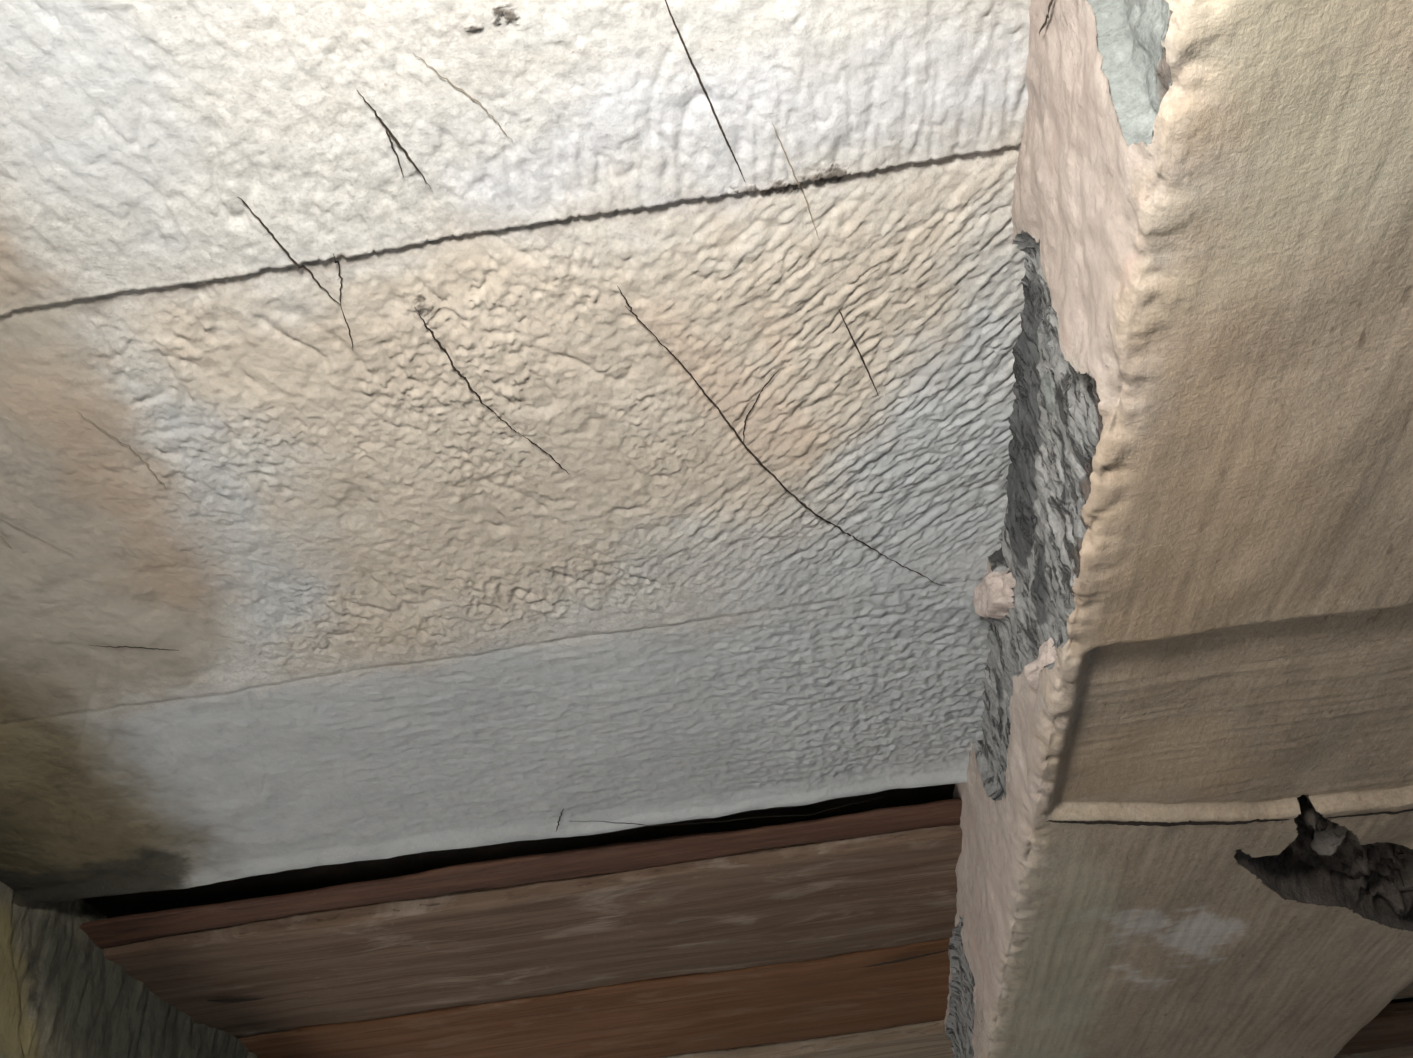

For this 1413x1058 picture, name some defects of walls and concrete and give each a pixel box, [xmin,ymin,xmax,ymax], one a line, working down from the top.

flaking render [1086,0,1173,147]
crack [238,197,353,350]
crack [415,308,569,474]
crack [617,286,945,586]
flaking render [972,230,1103,802]
crack [1044,809,1413,827]
spalling [1234,795,1413,932]
flaking render [945,915,977,1058]